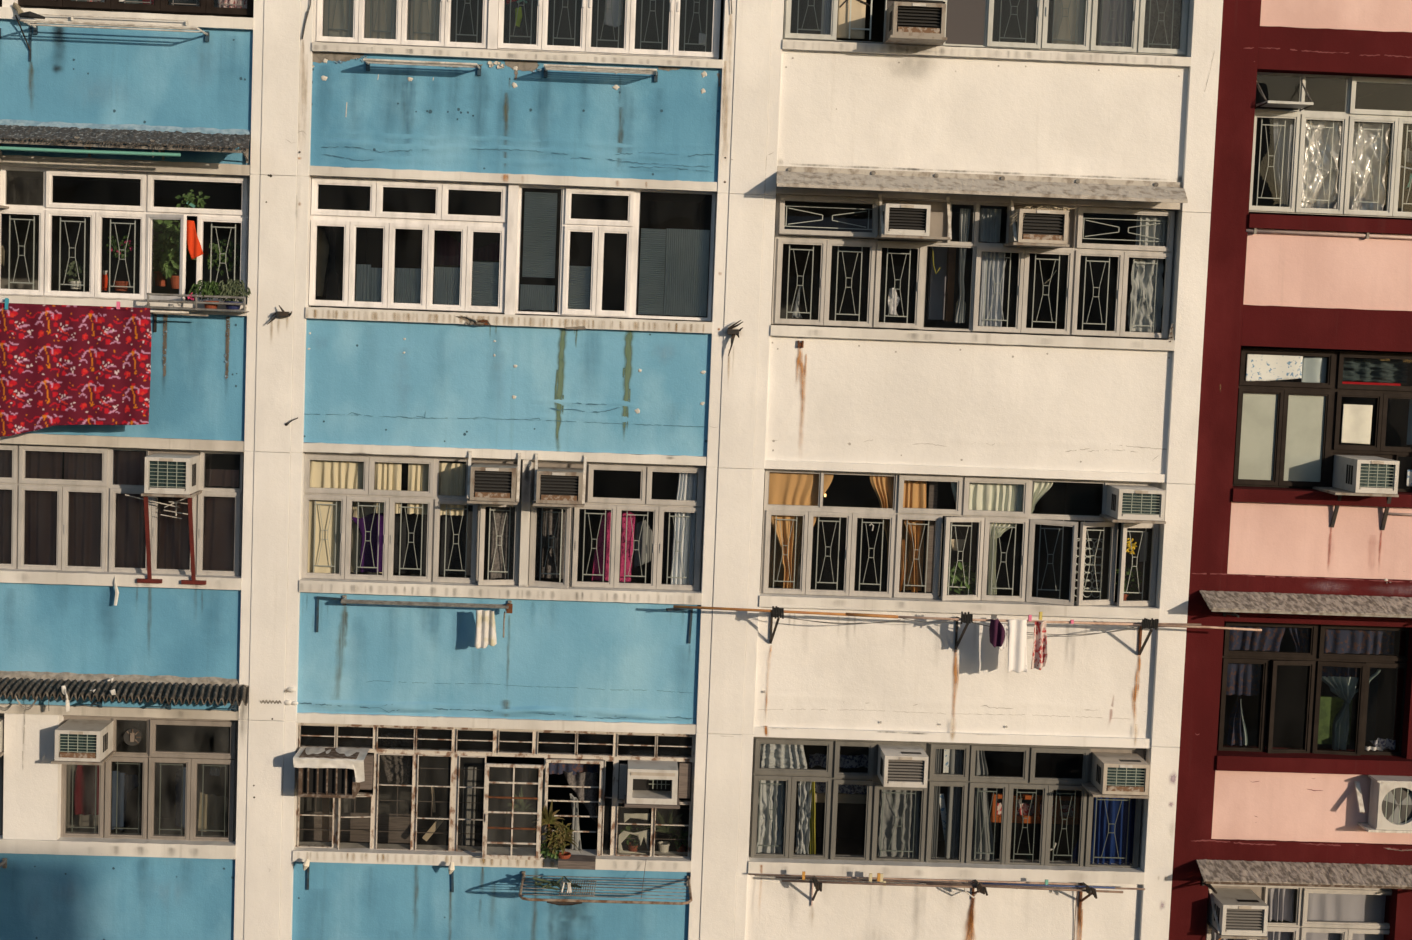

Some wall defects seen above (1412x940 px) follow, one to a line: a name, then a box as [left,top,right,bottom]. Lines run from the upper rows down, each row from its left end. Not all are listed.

water stain [555,328,577,441]
water stain [623,330,633,430]
corrosion [797,348,807,412]